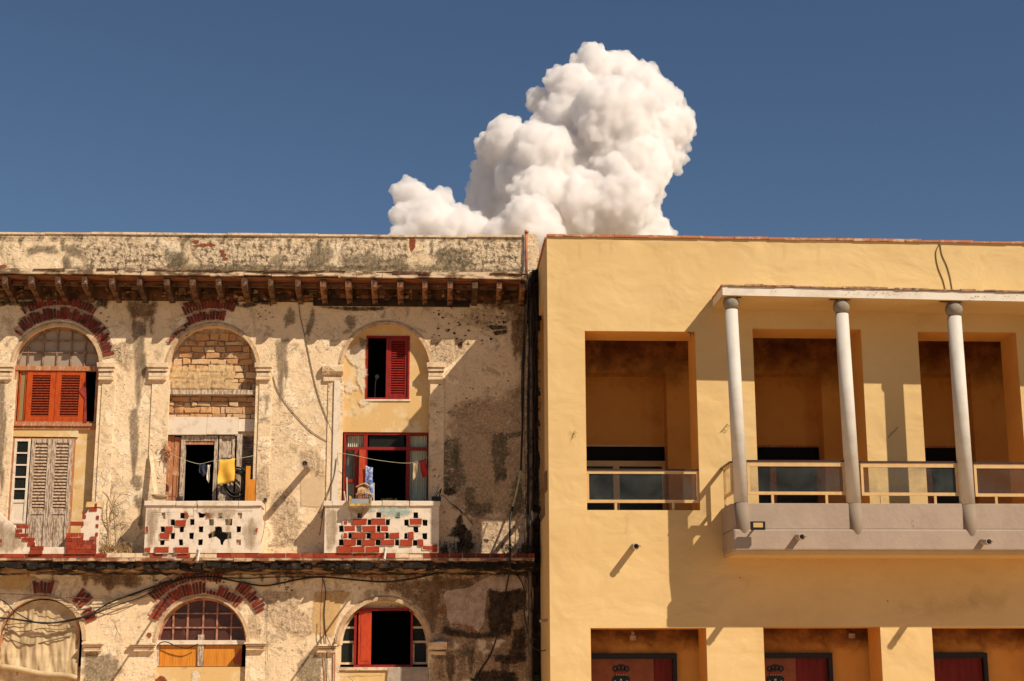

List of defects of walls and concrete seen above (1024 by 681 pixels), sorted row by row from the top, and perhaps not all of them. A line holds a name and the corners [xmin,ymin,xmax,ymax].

leakage [18,239,86,267]
leakage [157,240,189,269]
flaking render [14,296,133,370]
peeling [344,344,368,406]
leakage [128,301,158,546]
leakage [483,300,541,518]
leakage [444,438,492,547]
flaking render [16,525,44,554]
flaking render [65,503,99,554]
flaking render [337,518,438,553]
flaking render [148,573,312,637]
leakage [239,572,534,681]